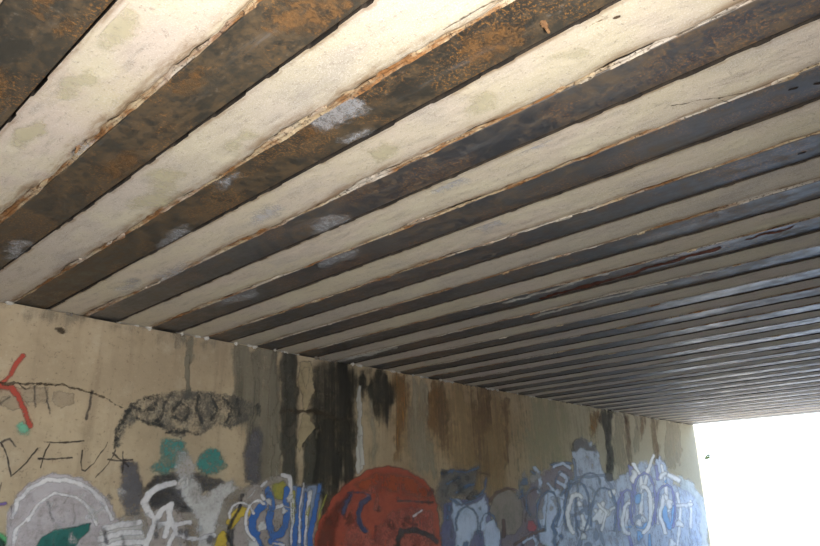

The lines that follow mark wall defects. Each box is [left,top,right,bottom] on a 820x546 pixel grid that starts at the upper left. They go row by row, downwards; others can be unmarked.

rust [262,0,352,35]
rust [458,25,534,63]
spalling [0,0,820,340]
rust [539,246,722,299]
crack [0,381,123,408]
leakage [233,344,398,516]